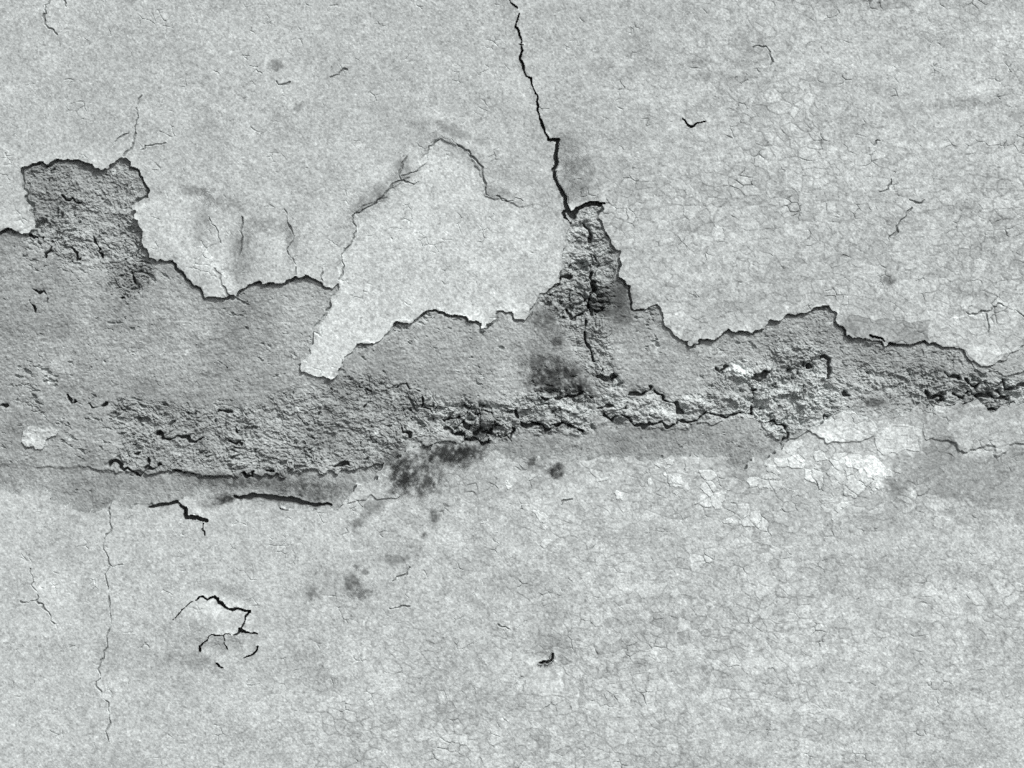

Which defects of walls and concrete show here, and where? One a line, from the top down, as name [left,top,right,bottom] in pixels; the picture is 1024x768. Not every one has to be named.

crack [509,0,606,225]
peeling [0,138,1024,512]
crack [148,500,209,536]
crack [233,492,333,511]
crack [95,500,123,742]
crack [172,595,259,668]
crack [538,652,554,665]